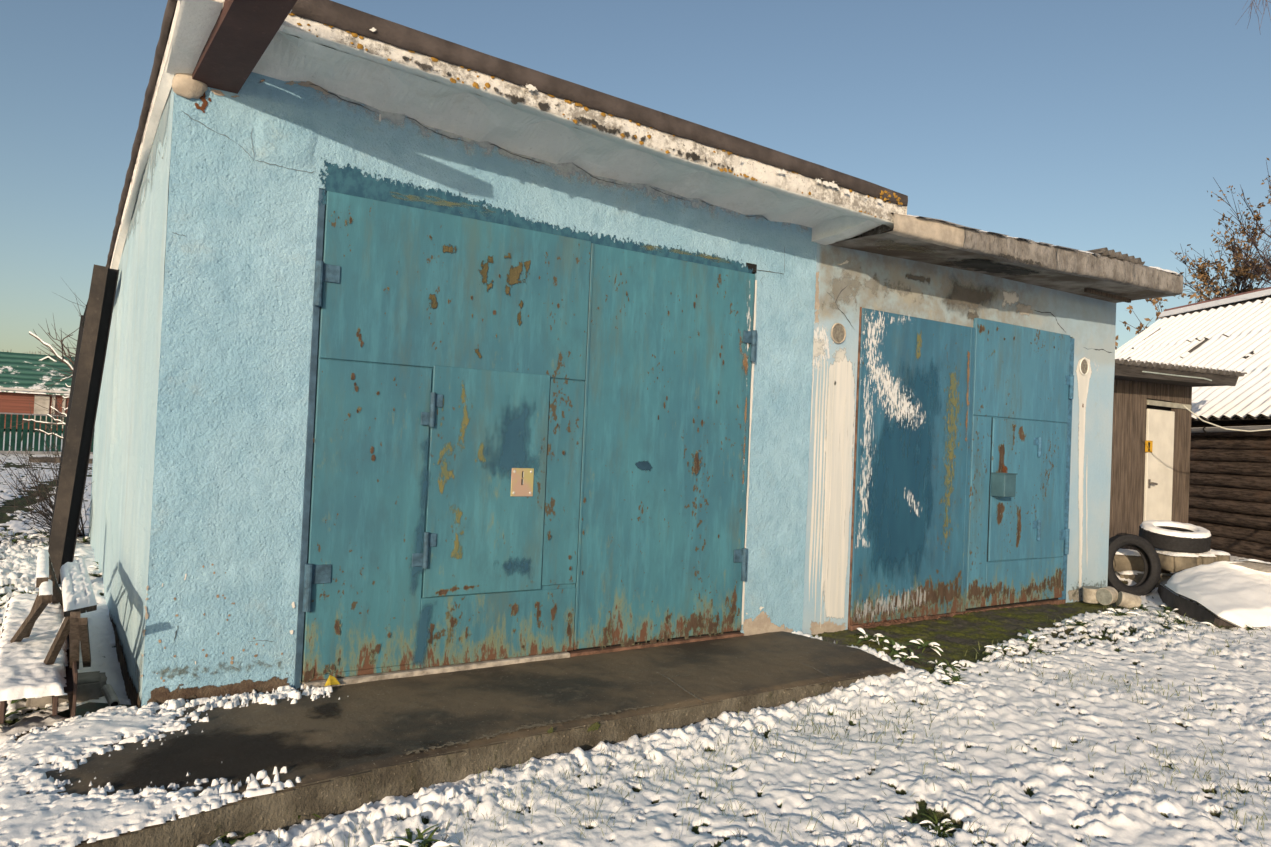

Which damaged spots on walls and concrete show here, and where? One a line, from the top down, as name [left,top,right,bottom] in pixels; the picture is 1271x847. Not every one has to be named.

corrosion [195,92,211,113]
water stain [125,95,170,241]
crack [184,112,316,173]
peeling [642,245,730,263]
peeling [428,294,450,325]
peeling [470,253,540,326]
water stain [831,270,930,309]
water stain [944,258,1041,320]
corrosion [436,585,479,596]
corrosion [534,602,573,640]
corrosion [600,581,740,649]
corrosion [852,568,1064,624]